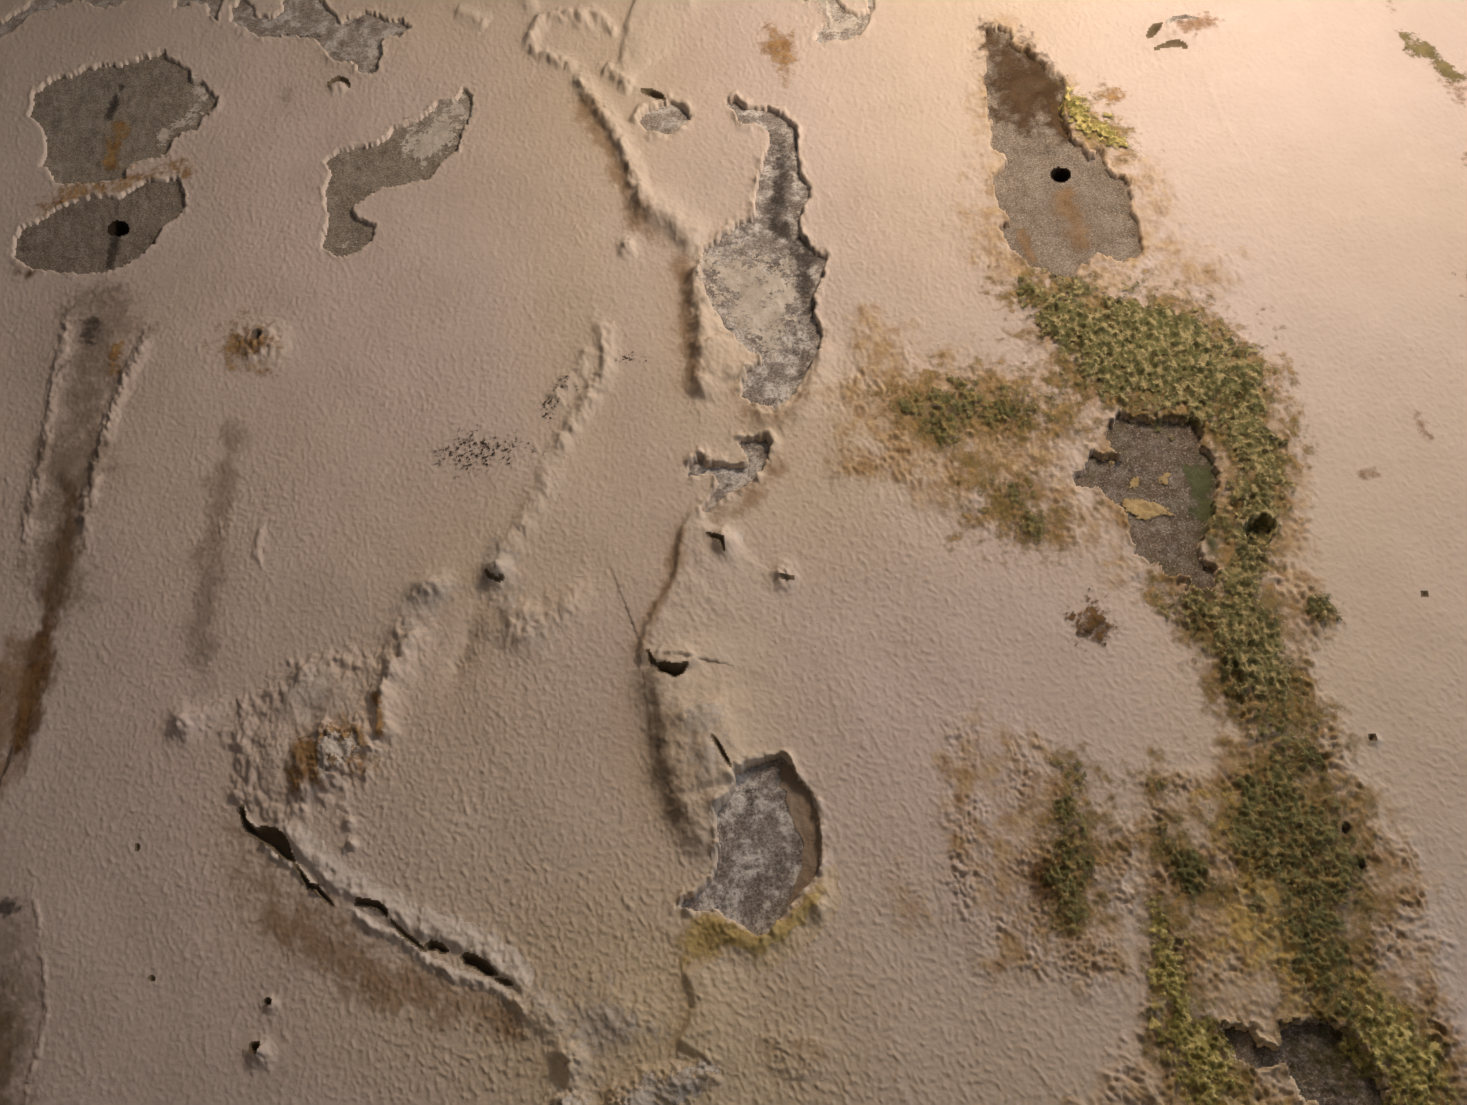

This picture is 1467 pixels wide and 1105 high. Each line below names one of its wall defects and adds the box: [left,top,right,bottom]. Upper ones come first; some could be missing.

peeling [0,0,131,41]
peeling [170,0,414,80]
peeling [9,44,221,277]
peeling [318,83,477,260]
damp [0,481,80,775]
peeling [674,0,1467,1105]
damp [1065,588,1118,651]
crack [239,803,535,1004]
damp [1031,861,1064,900]